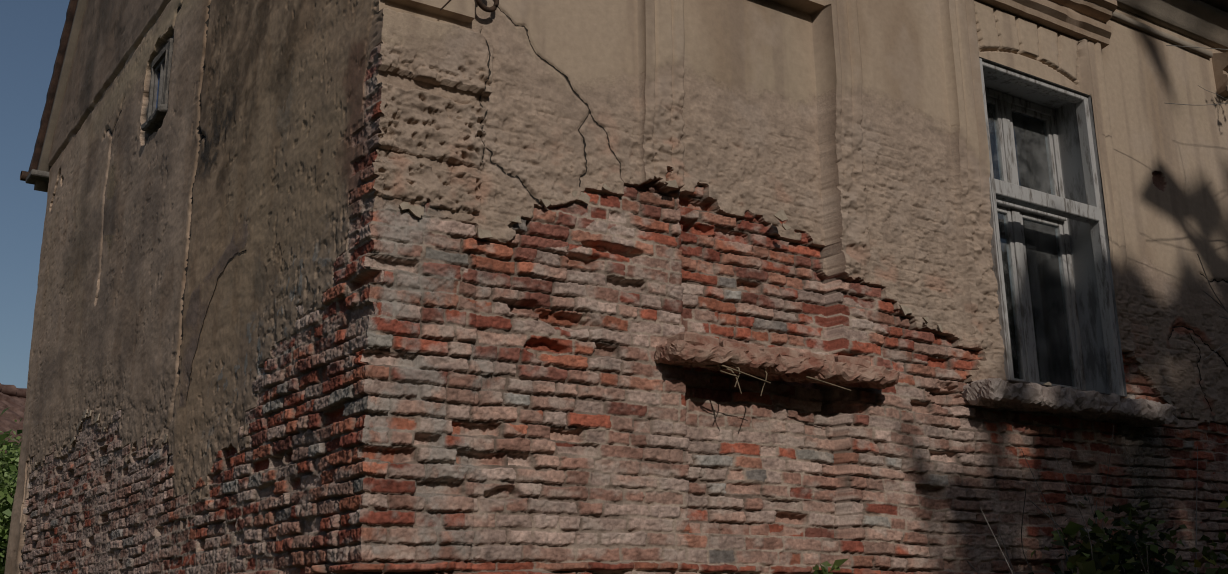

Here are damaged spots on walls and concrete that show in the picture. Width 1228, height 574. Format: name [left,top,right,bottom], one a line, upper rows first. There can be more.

crack [177,2,211,374]
flaking render [18,26,384,574]
crack [477,0,624,204]
flaking render [352,7,1139,574]
spalling [1152,171,1168,192]
peeling [1121,256,1228,574]